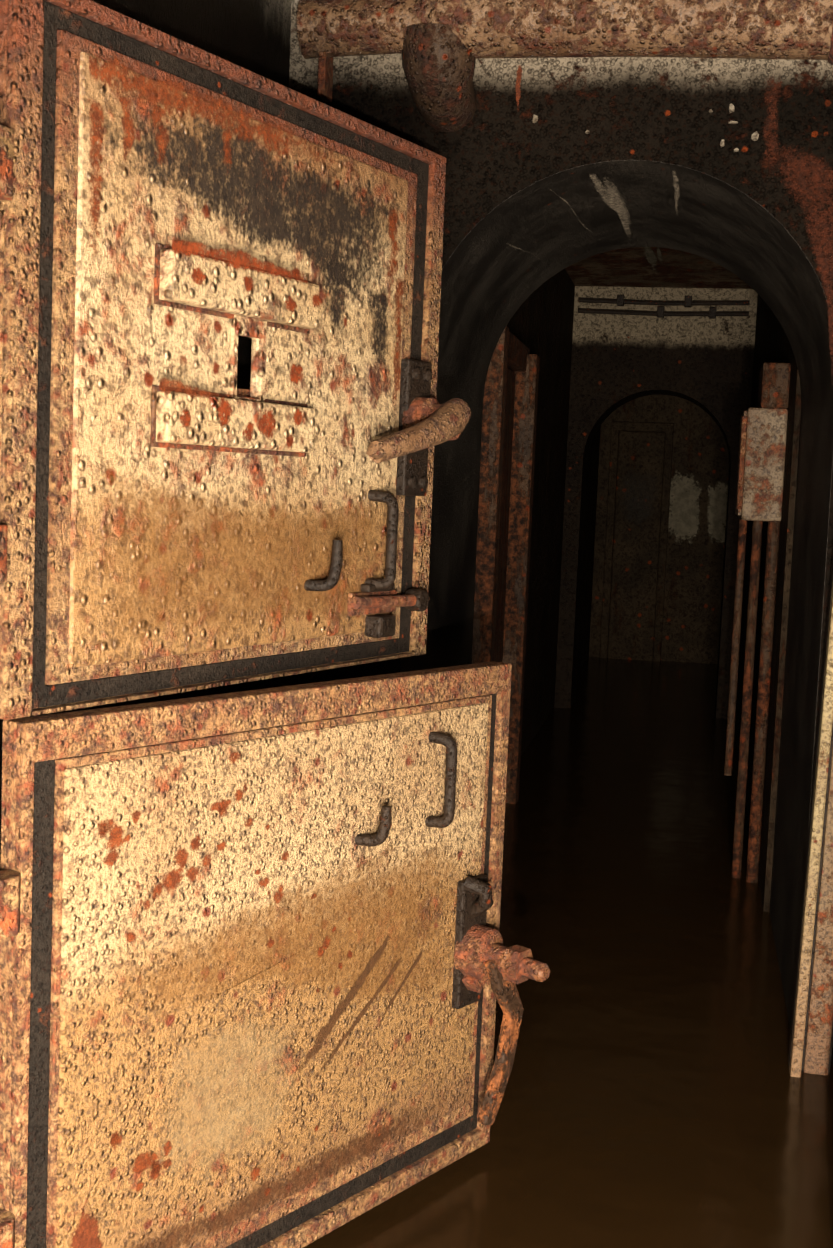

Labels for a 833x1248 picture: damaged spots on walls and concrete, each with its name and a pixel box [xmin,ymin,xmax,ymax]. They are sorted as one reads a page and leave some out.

corrosion [763,78,833,366]